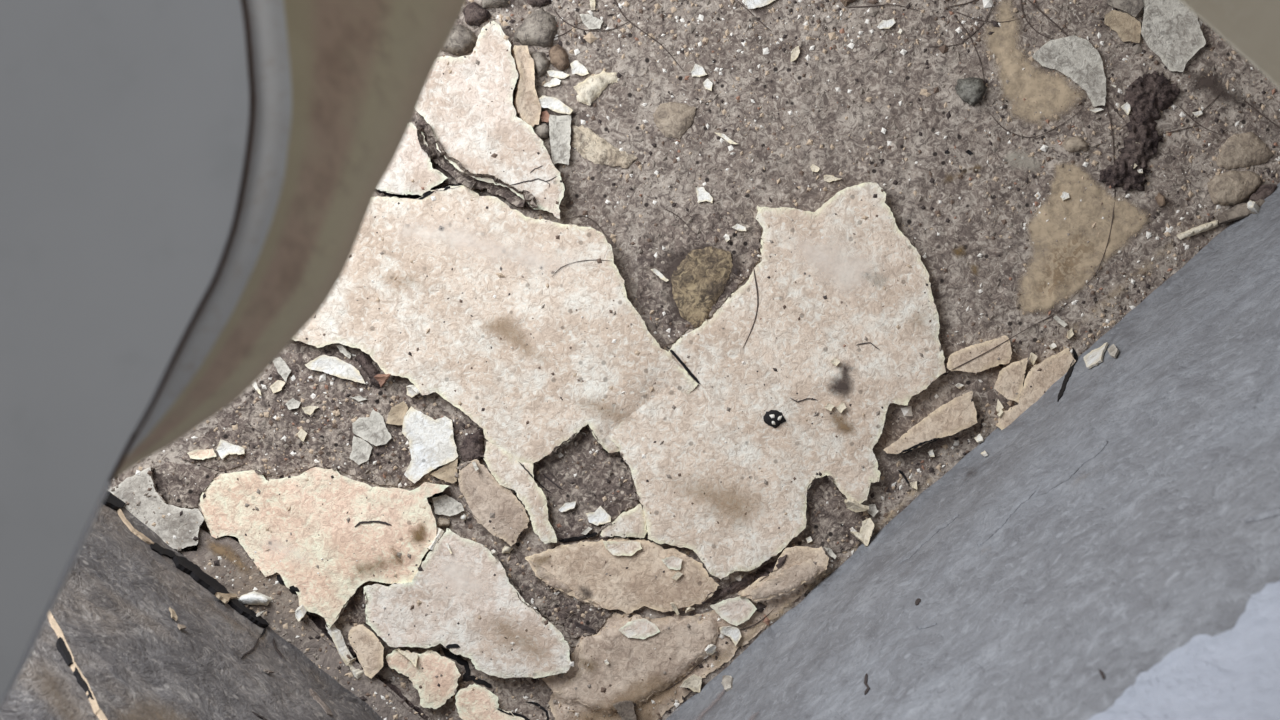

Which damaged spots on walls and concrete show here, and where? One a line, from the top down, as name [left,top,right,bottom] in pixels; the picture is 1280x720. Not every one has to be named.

peeling [512,45,571,165]
crack [376,184,461,199]
crack [512,166,555,187]
spalling [636,187,761,344]
crack [48,612,108,720]
crack [103,491,282,658]
spalling [151,350,484,554]
spalling [326,585,367,679]
crack [276,575,429,720]
crack [355,520,391,528]
spalling [535,427,642,556]
spalling [806,475,878,559]